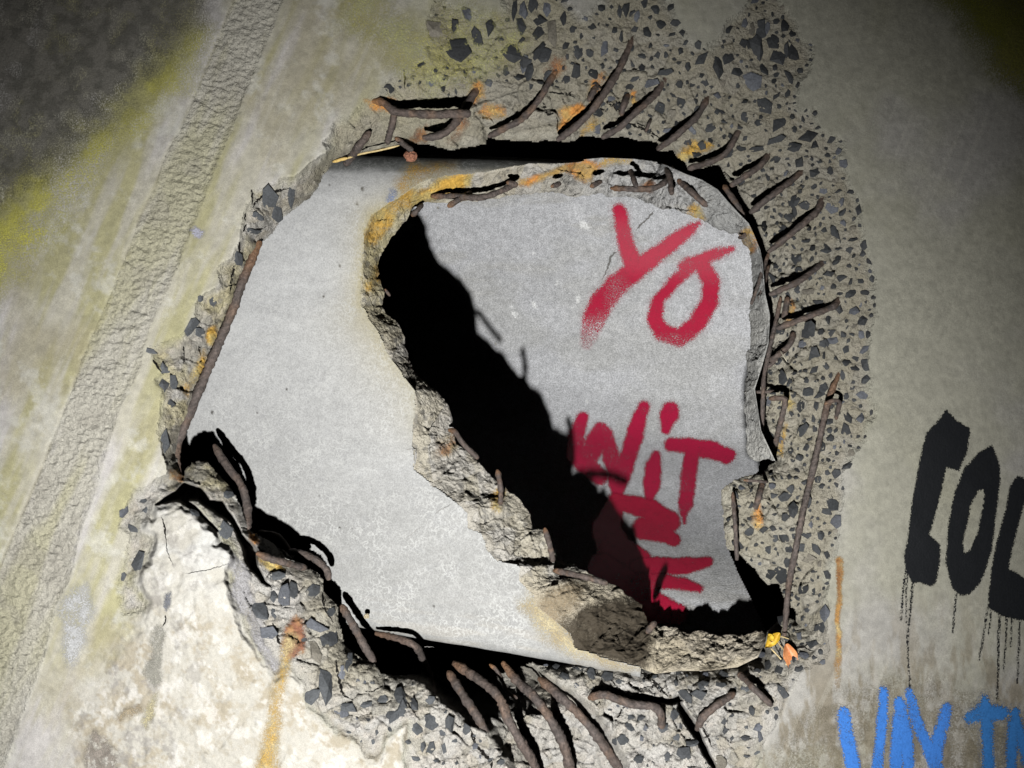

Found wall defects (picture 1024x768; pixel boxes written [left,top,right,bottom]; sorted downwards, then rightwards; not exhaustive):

rust [364,163,473,246]
rust [472,81,504,118]
rust [518,158,628,186]
rust [558,103,596,133]
rust [678,141,712,161]
rust [184,326,217,395]
spalling [116,0,880,768]
rust [835,557,844,672]
rust [256,615,305,768]